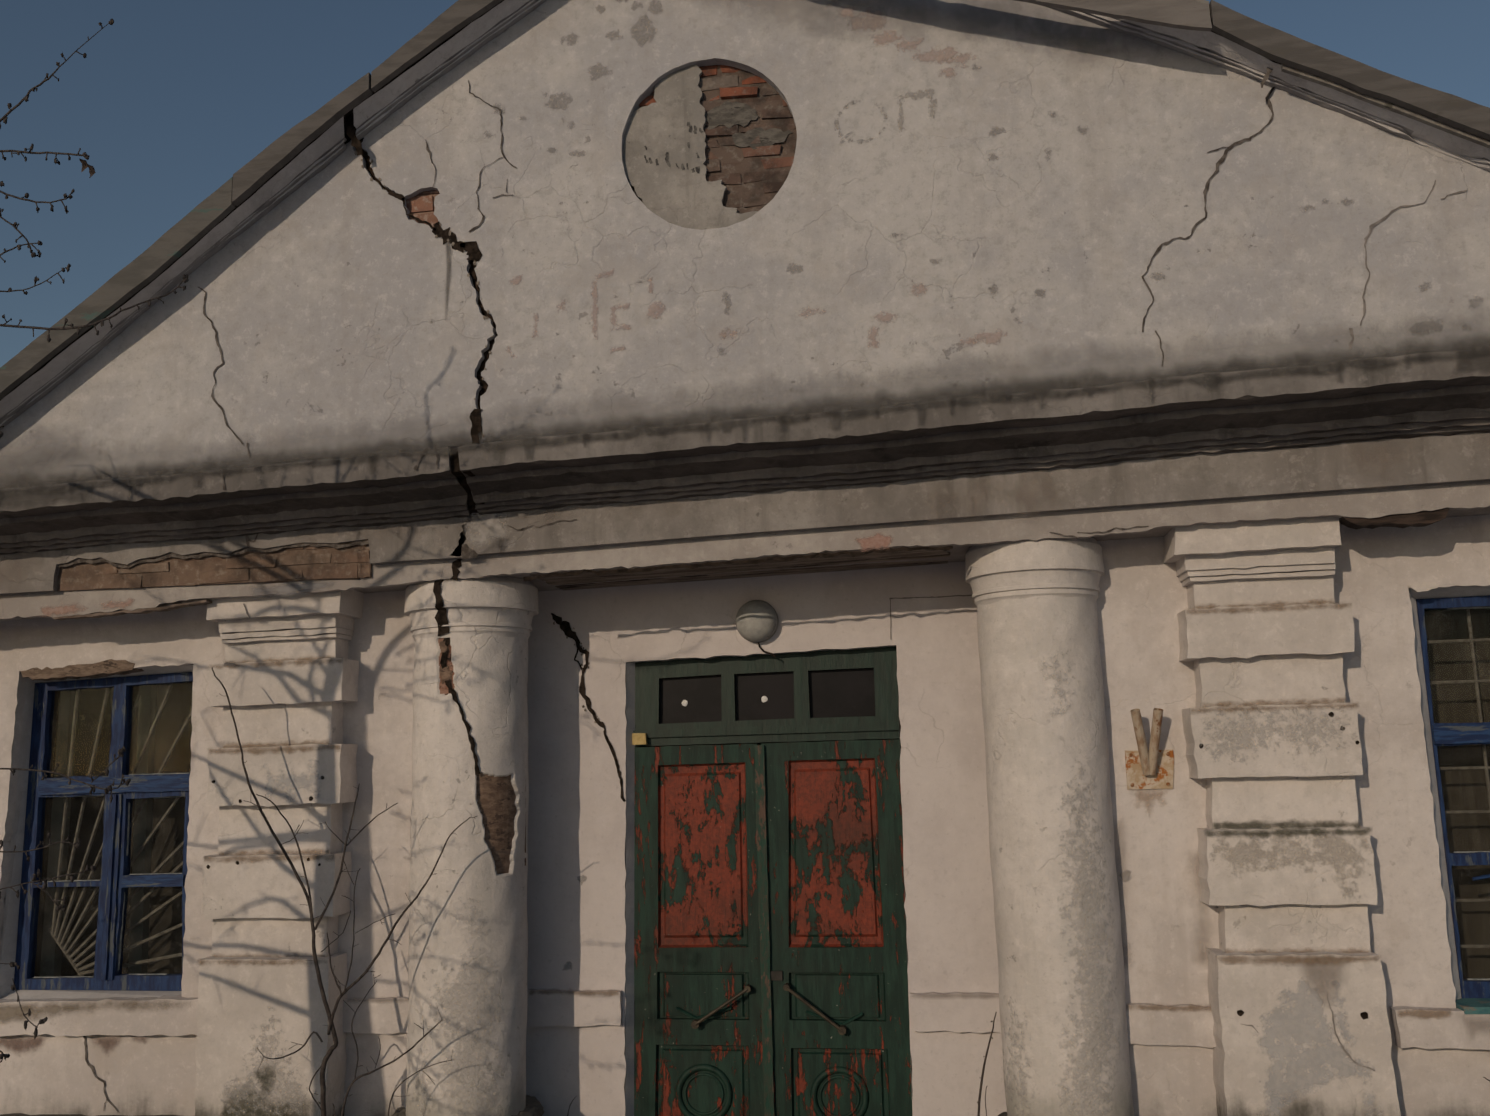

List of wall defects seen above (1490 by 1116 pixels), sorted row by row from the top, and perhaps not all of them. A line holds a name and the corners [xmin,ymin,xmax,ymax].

flaking render [638,91,656,109]
flaking render [699,65,797,214]
crack [1141,61,1276,366]
crack [1349,180,1467,349]
crack [198,287,250,490]
crack [344,80,577,775]
flaking render [51,540,372,620]
flaking render [1339,509,1449,530]
flaking render [21,659,144,681]
crack [551,613,625,802]
flaking render [476,773,526,874]